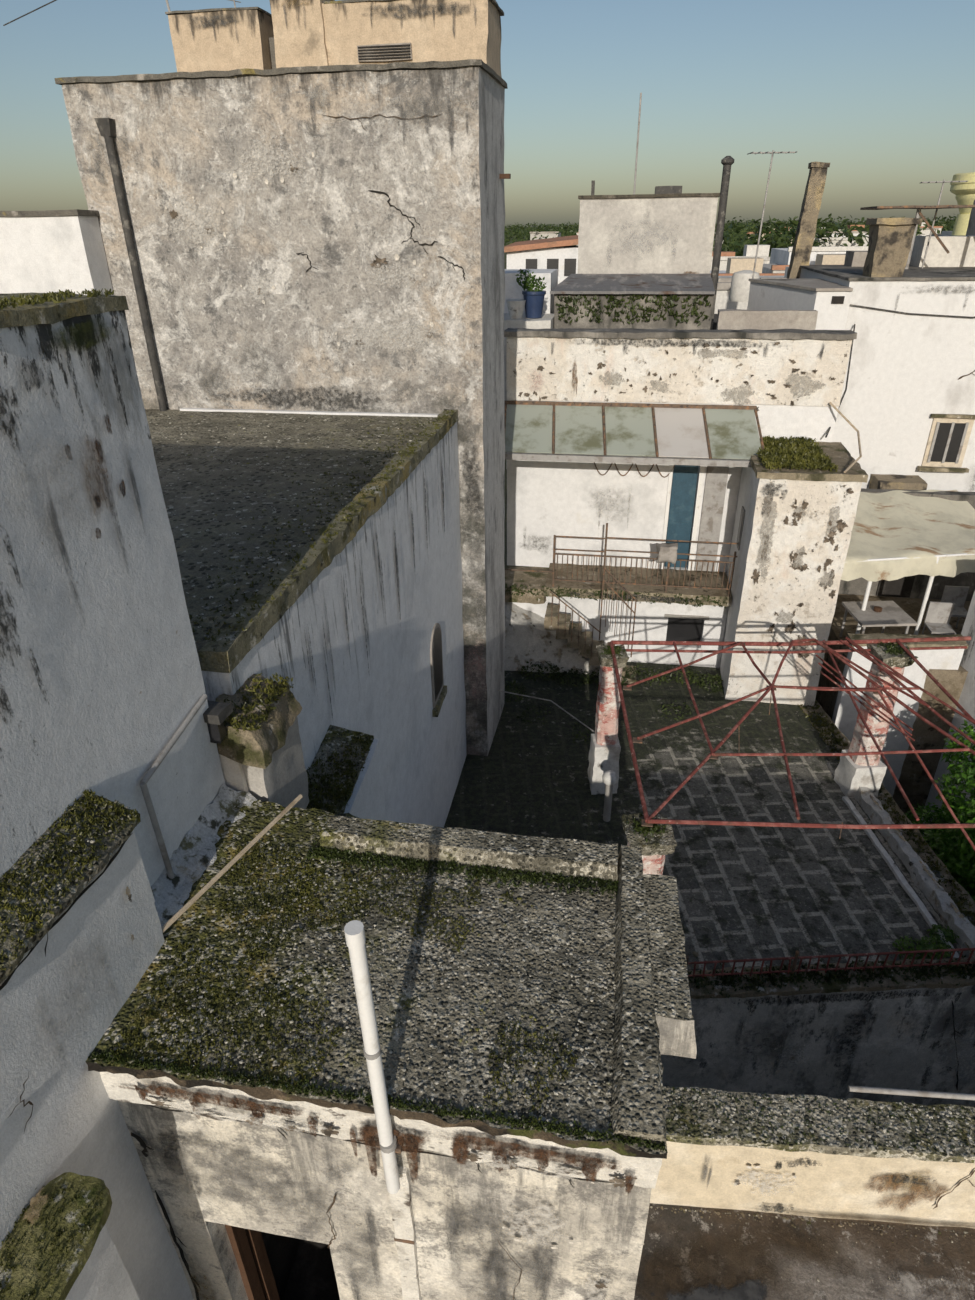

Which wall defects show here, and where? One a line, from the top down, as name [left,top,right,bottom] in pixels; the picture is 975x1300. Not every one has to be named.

damp [190,16,237,39]
damp [370,2,476,36]
crack [368,190,465,280]
peeling [588,362,677,395]
peeling [711,359,836,413]
peeling [751,479,810,589]
peeling [790,488,854,598]
peeling [768,603,810,658]
corrosion [119,1084,317,1137]
corrosion [350,1125,636,1194]
damp [868,1175,946,1211]
damp [476,1248,551,1300]